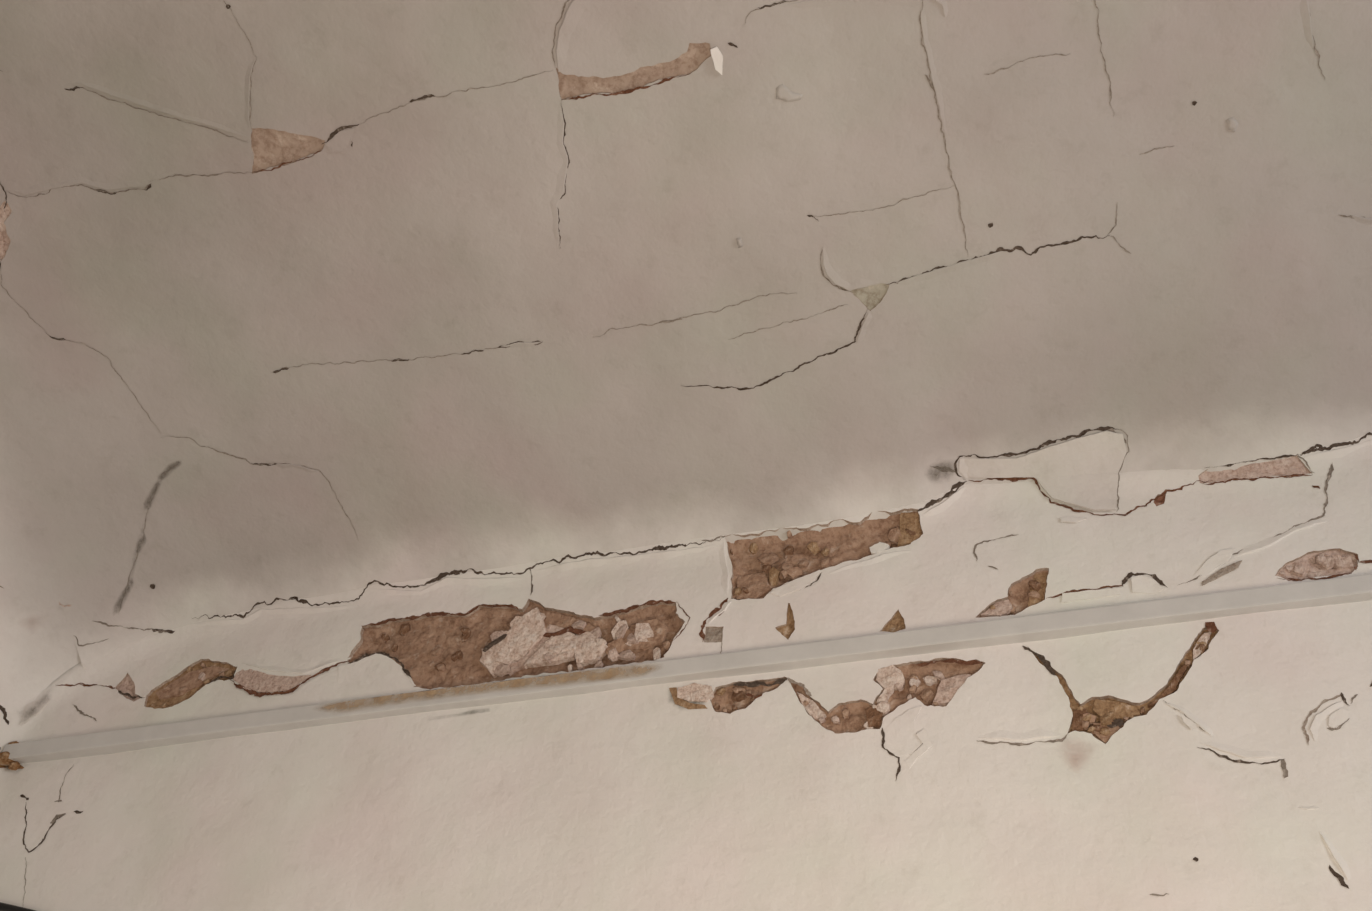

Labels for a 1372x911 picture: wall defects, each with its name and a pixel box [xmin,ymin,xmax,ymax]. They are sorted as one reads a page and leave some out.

spalling [19,599,685,726]
crack [73,436,724,647]
crack [675,598,732,653]
spalling [702,508,923,639]
spalling [669,658,985,780]
crack [917,426,1213,523]
spalling [976,568,1168,618]
spalling [976,622,1219,746]
crack [1179,432,1372,586]
spalling [1275,548,1372,581]
crack [20,767,83,900]
crack [1163,683,1372,888]